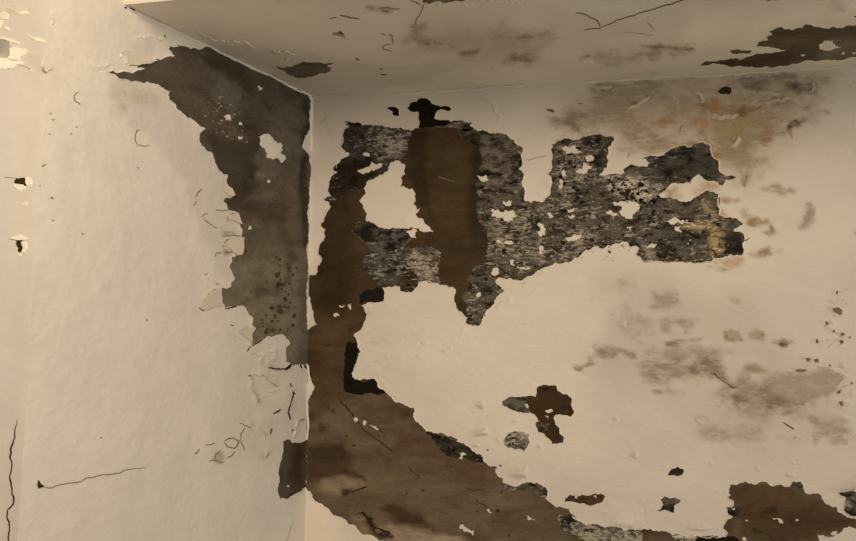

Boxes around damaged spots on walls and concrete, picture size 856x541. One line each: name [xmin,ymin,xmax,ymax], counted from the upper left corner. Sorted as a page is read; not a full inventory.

peeling [0,7,45,73]
peeling [276,59,339,79]
crack [380,33,394,75]
crack [379,0,425,24]
crack [577,0,683,36]
peeling [695,15,856,96]
peeling [105,44,317,367]
spalling [9,235,28,257]
peeling [277,95,856,541]
crack [195,363,307,463]
crack [6,420,18,541]
crack [46,467,147,489]